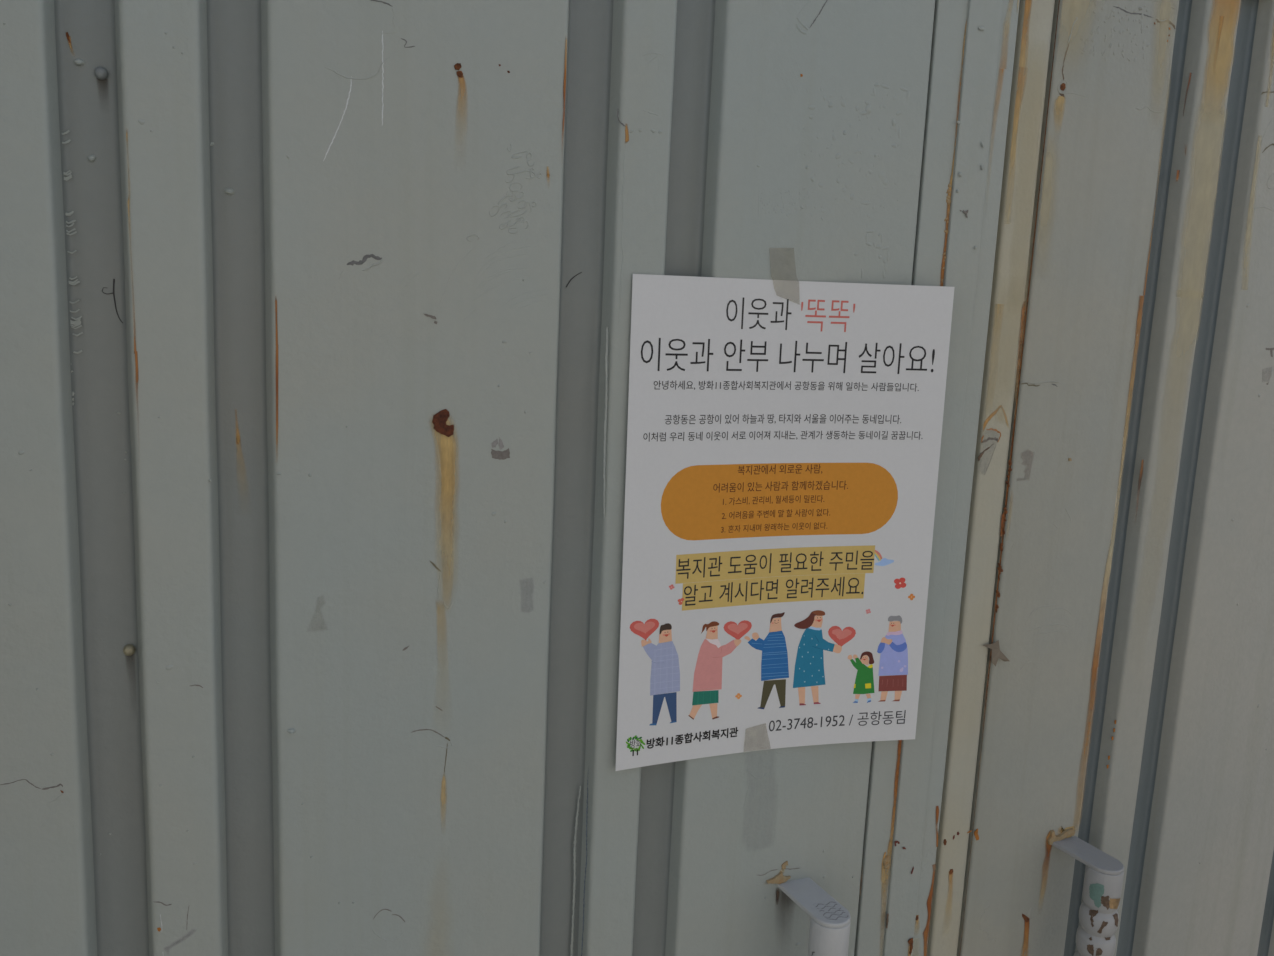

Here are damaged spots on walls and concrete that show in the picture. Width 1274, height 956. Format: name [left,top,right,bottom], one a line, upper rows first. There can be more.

crack [370,0,415,48]
rust [454,63,465,98]
rust [1182,0,1240,333]
rust [1121,207,1156,468]
rust [432,409,455,566]
rust [936,0,1068,873]
rust [1083,513,1117,758]
rust [884,740,906,892]
rust [908,864,953,956]
rust [1022,907,1034,956]